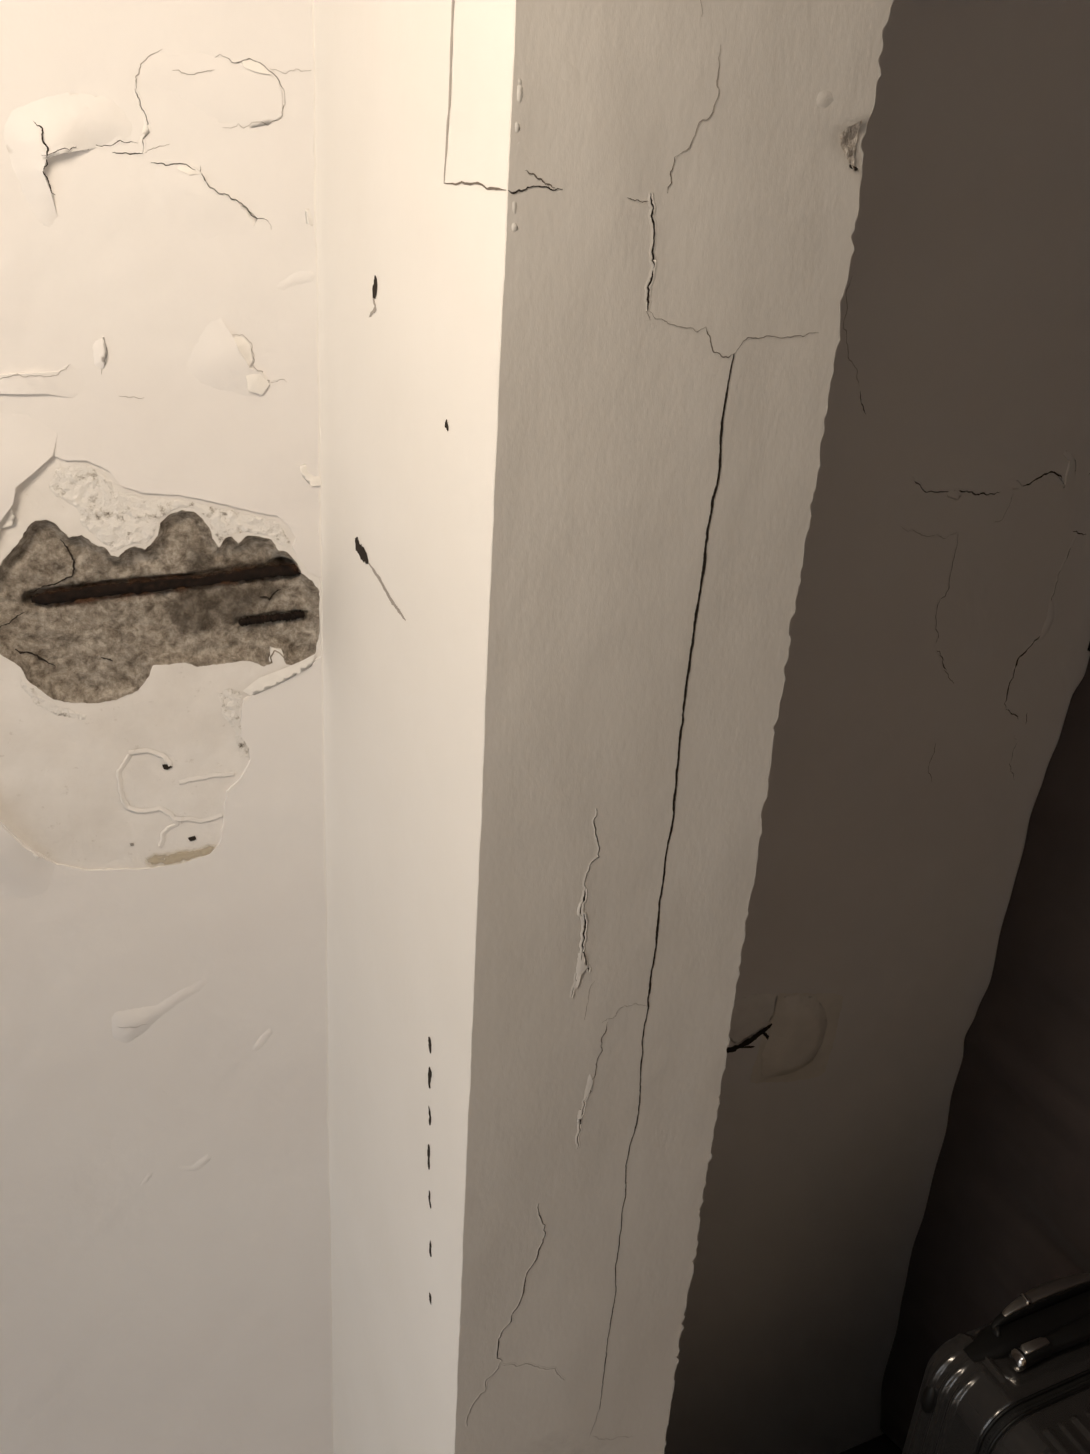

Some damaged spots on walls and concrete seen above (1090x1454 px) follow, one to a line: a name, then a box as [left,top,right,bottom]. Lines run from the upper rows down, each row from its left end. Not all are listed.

crack [444,0,563,194]
spalling [0,413,321,899]
crack [569,44,867,1440]
crack [900,450,1090,683]
crack [1003,531,1085,781]
crack [465,1203,566,1427]